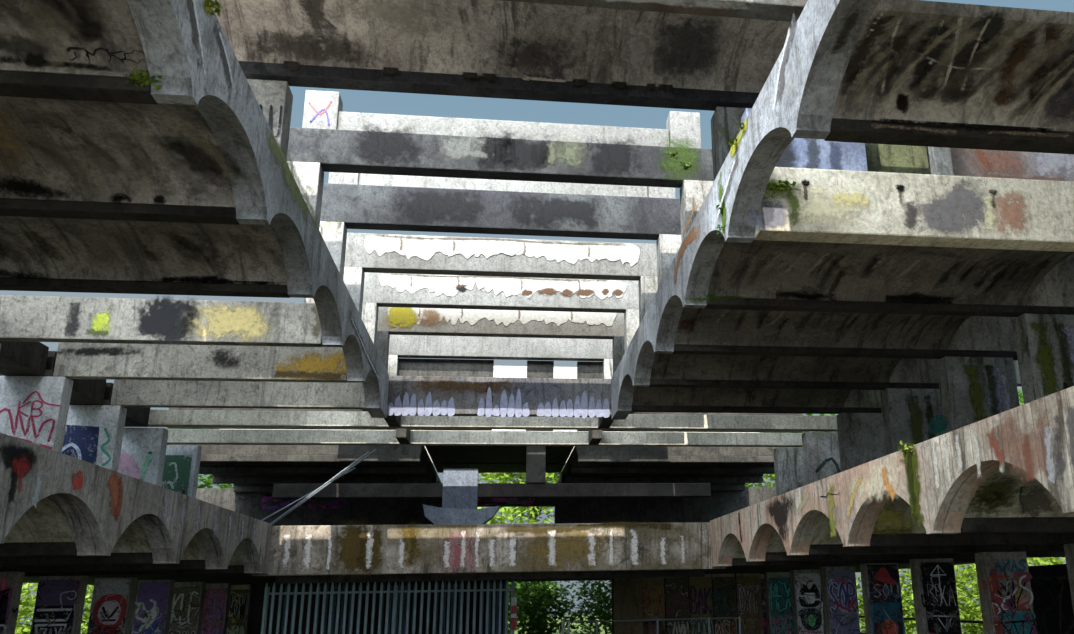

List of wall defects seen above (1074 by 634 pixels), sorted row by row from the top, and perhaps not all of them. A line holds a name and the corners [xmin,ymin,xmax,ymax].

water stain [250,0,440,68]
water stain [606,0,760,85]
water stain [832,8,1074,121]
water stain [357,125,419,162]
water stain [443,132,556,169]
water stain [590,138,636,174]
peeling [364,235,640,267]
peeling [379,274,626,326]
corrosion [392,273,623,296]
water stain [357,530,374,570]
efflorescence [443,531,495,567]
water stain [505,521,671,566]